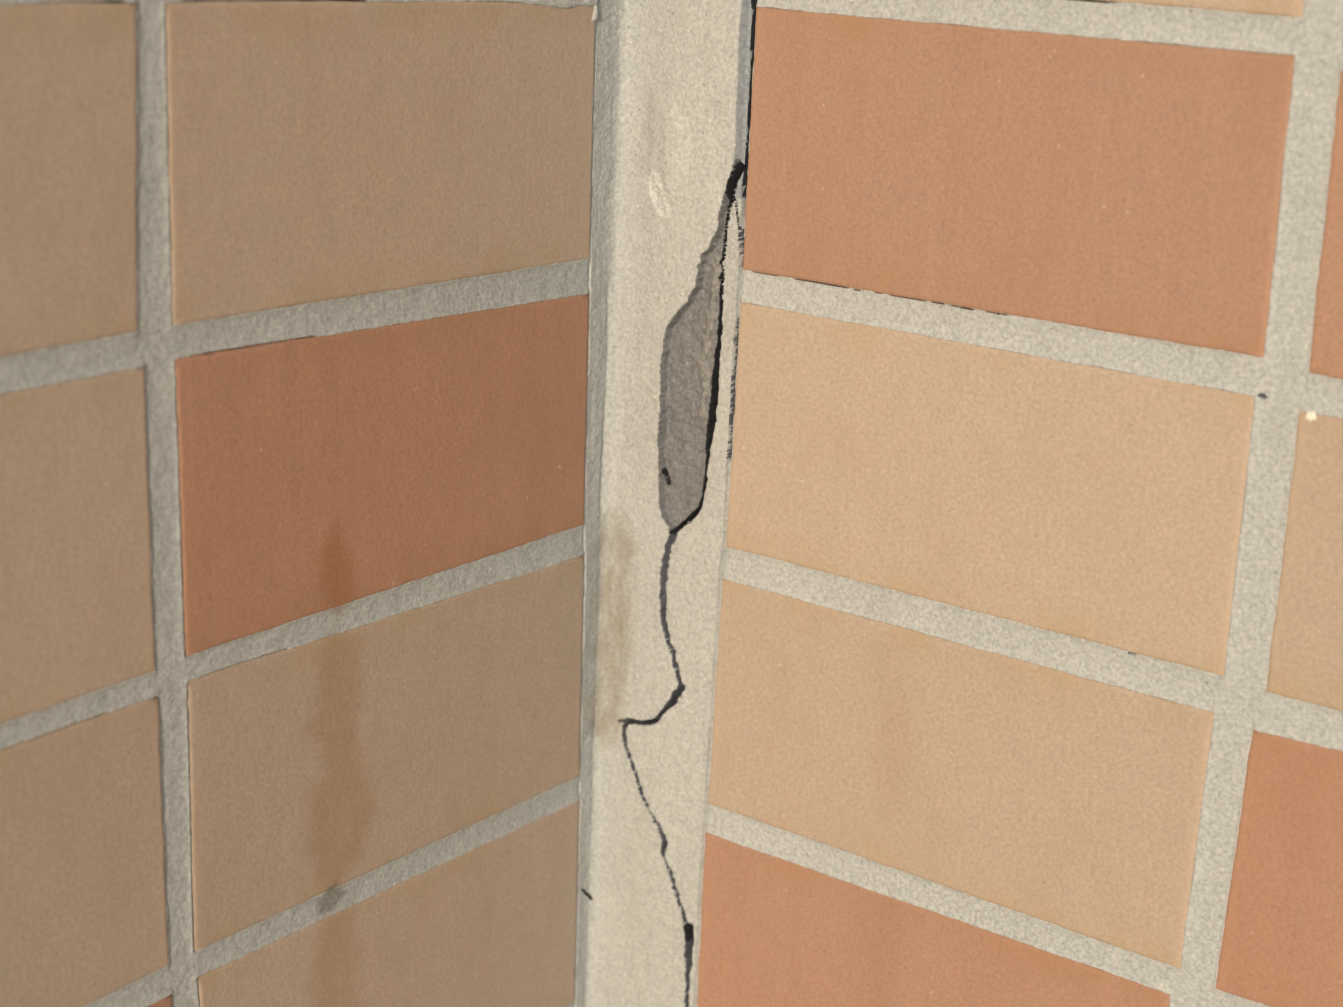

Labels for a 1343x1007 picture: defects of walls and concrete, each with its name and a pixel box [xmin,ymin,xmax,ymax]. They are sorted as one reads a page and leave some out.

spalling [657,158,748,535]
crack [618,533,694,1007]